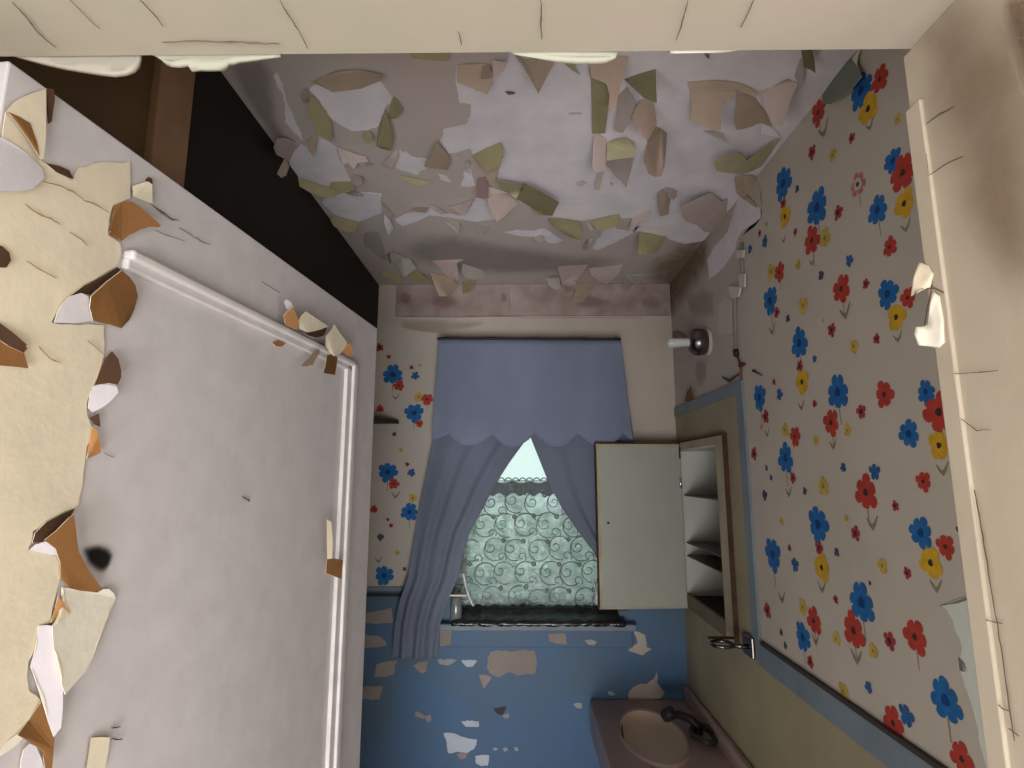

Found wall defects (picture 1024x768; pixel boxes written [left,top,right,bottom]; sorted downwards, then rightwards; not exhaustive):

crack [12,2,55,47]
crack [140,0,307,47]
peeling [0,88,74,192]
peeling [108,177,161,241]
peeling [274,49,858,296]
peeling [0,323,28,368]
peeling [54,267,138,328]
peeling [283,299,353,375]
peeling [911,262,947,348]
peeling [86,351,121,459]
peeling [0,508,116,768]
crack [974,490,1019,741]